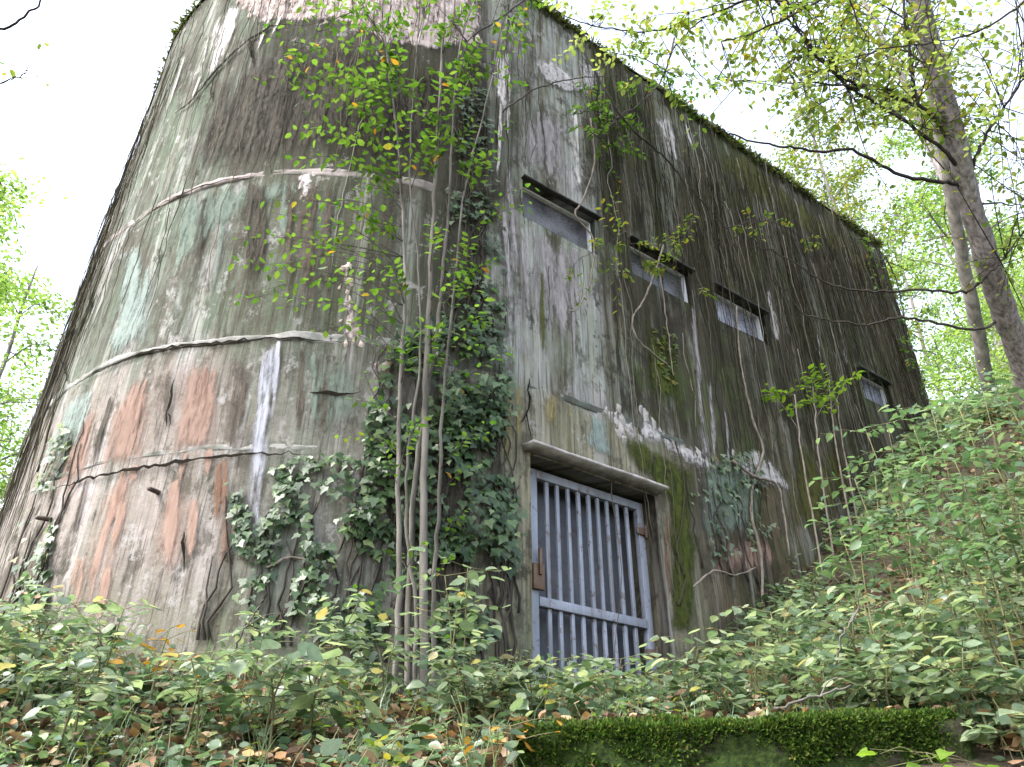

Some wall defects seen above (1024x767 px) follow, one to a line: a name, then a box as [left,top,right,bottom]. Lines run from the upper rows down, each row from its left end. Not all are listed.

leakage [657,119,692,159]
rust [63,414,94,504]
rust [72,379,147,616]
crack [57,450,303,488]
rust [164,367,228,562]
leakage [253,341,280,530]
leakage [692,290,732,517]
leakage [768,292,779,339]